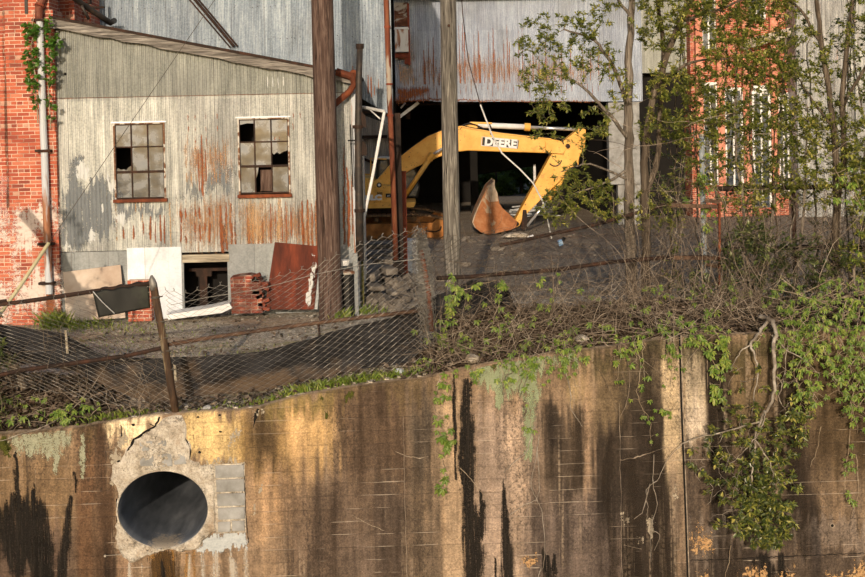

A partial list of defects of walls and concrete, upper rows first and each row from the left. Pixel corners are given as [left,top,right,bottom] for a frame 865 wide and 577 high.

corrosion [396,41,441,105]
corrosion [457,24,610,103]
peeling [60,155,236,252]
corrosion [179,115,318,310]
damp [0,452,77,577]
spalling [110,423,135,464]
crack [121,417,160,471]
damp [452,373,515,577]
damp [541,547,558,577]